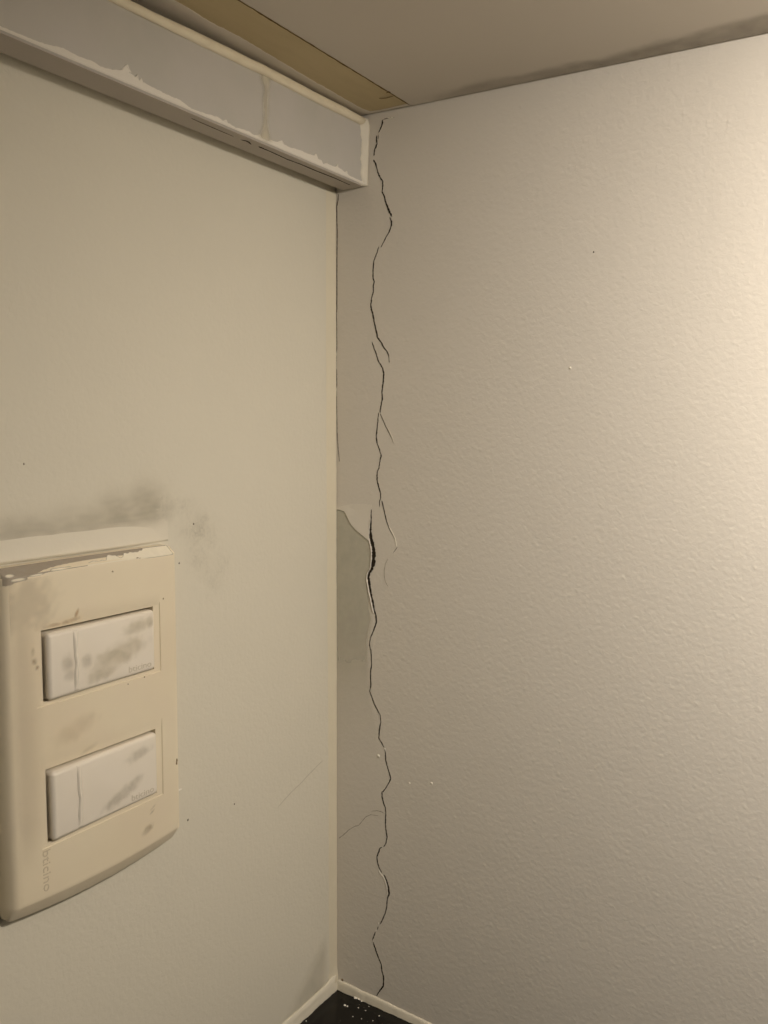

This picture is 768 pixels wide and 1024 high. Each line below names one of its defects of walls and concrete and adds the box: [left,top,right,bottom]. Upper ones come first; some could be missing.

peeling [0,26,363,184]
crack [334,275,342,461]
peeling [336,504,372,639]
crack [339,117,397,996]